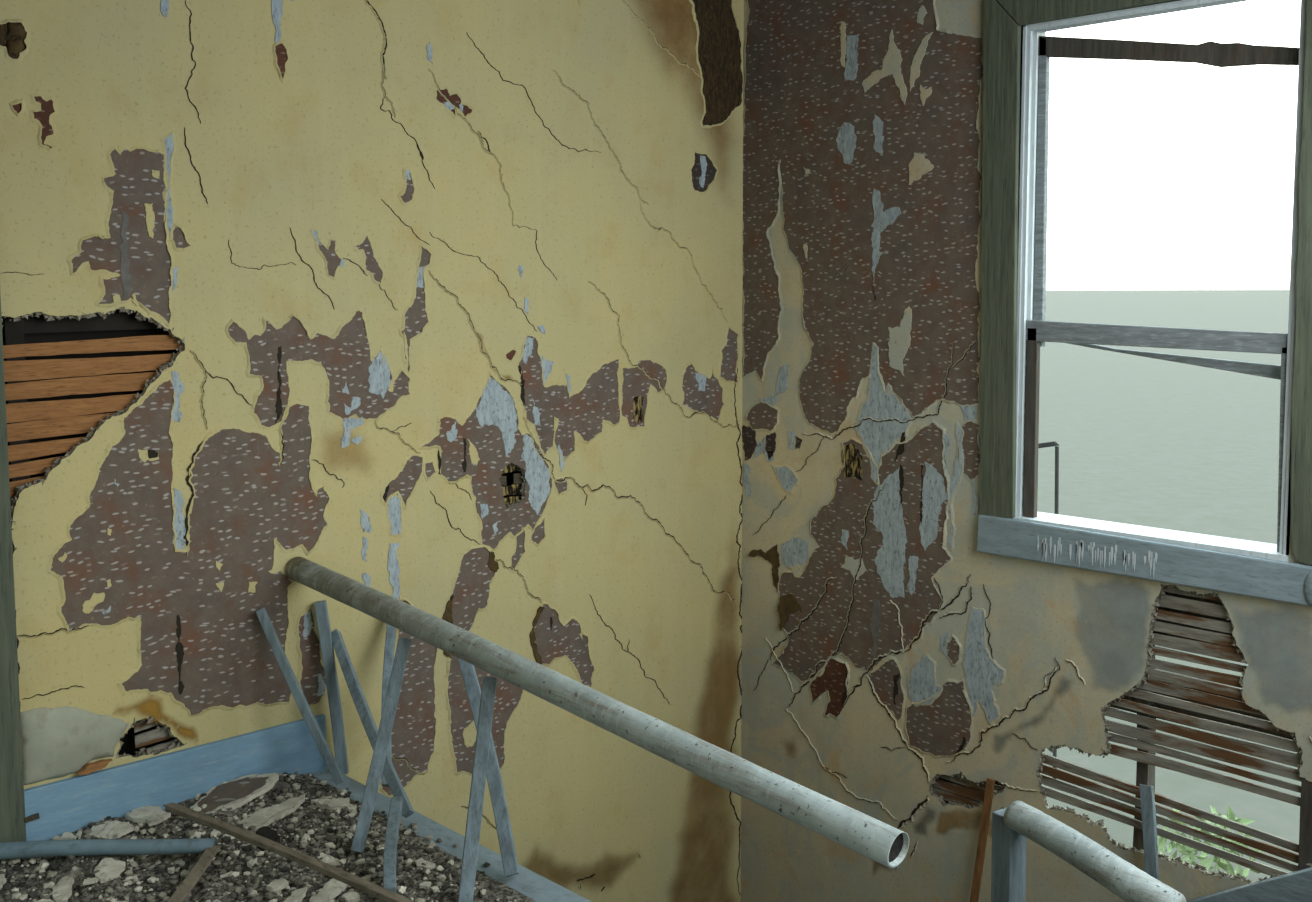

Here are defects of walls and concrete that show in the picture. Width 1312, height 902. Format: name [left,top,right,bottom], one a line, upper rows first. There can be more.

crack [184,0,208,204]
crack [228,228,335,310]
peeling [271,0,295,84]
crack [364,0,435,188]
crack [381,199,535,385]
crack [466,32,728,324]
crack [183,350,251,556]
peeling [2,144,433,717]
peeling [379,0,1007,809]
crack [15,610,89,700]
crack [523,281,1086,870]
flaking render [1036,584,1312,883]